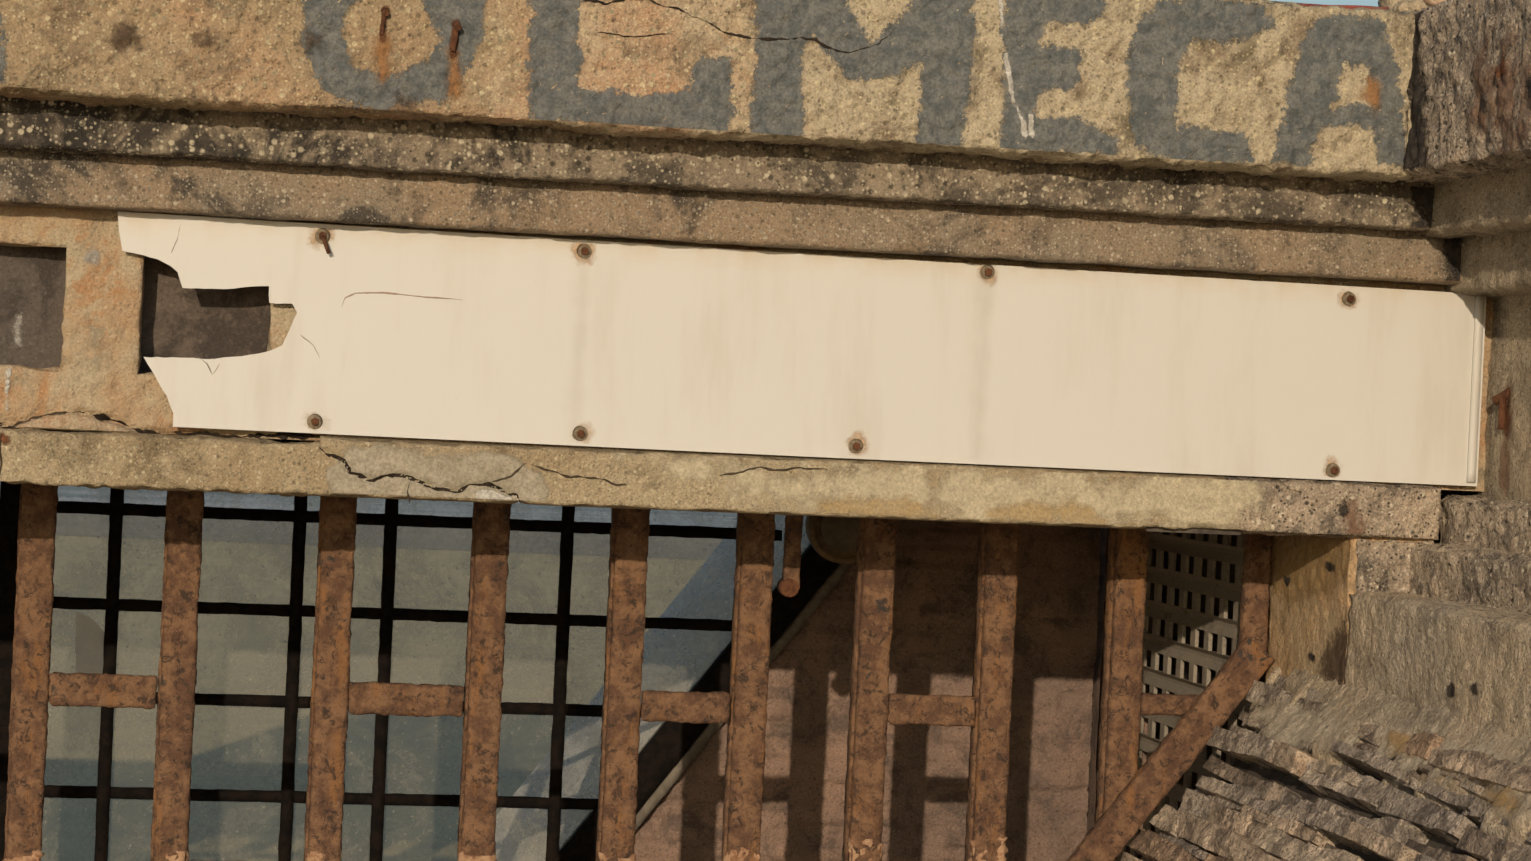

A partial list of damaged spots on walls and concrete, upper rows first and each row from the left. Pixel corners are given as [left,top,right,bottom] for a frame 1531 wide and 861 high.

rust [374,6,390,80]
rust [449,20,461,97]
crack [584,0,894,53]
crack [0,411,626,505]
crack [720,466,828,476]